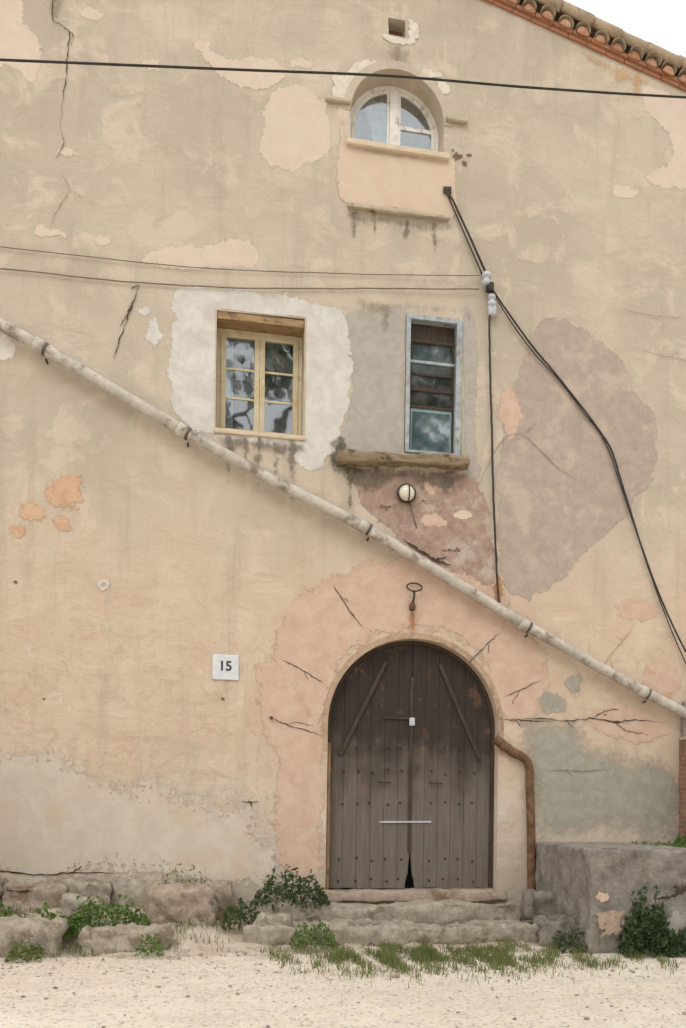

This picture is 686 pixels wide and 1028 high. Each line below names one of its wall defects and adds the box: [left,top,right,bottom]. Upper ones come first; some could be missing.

crack [51,0,78,222]
flaking render [0,332,16,361]
crack [114,285,139,357]
flaking render [0,467,552,891]
crack [275,719,317,734]
crack [501,681,654,734]